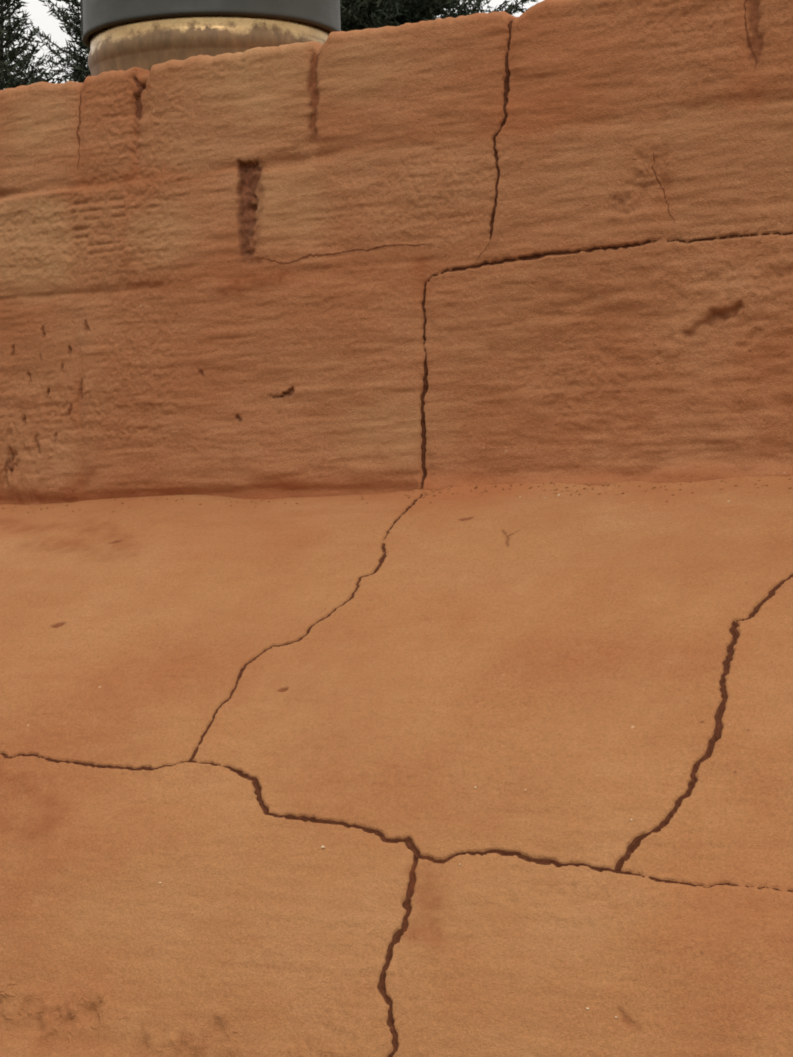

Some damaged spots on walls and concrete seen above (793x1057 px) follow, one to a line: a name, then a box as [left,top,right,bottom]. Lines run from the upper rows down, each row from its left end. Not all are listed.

crack [744,0,758,70]
crack [260,244,428,264]
crack [420,20,658,489]
crack [667,232,793,243]
crack [1,494,793,1057]